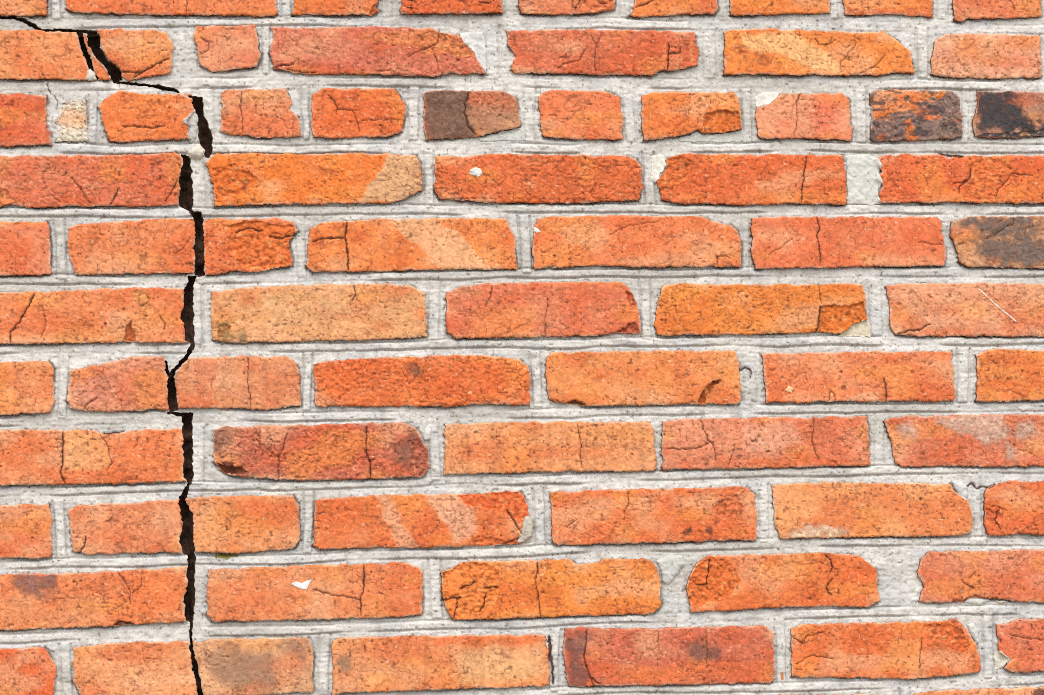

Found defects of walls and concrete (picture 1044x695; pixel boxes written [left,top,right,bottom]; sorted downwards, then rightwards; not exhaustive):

crack [0,0,212,695]